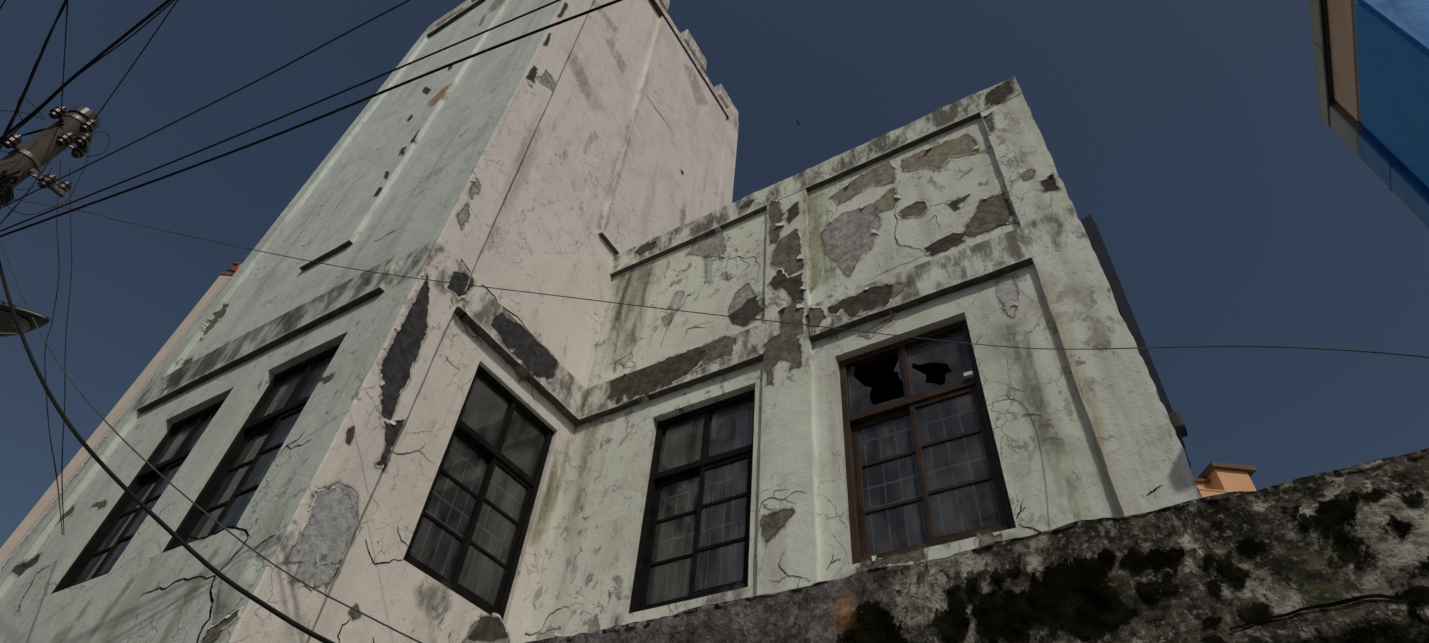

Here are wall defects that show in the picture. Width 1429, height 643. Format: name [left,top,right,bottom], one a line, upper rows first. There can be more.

peeling [819,81,1015,276]
spalling [1020,169,1059,192]
spalling [608,199,910,404]
peeling [995,276,1020,317]
spalling [375,271,474,474]
crack [140,526,276,643]
peeling [281,481,359,590]
crack [325,527,410,594]
peeling [462,613,512,643]
peeling [856,546,925,572]
crack [1016,499,1041,532]
crack [1229,594,1424,630]